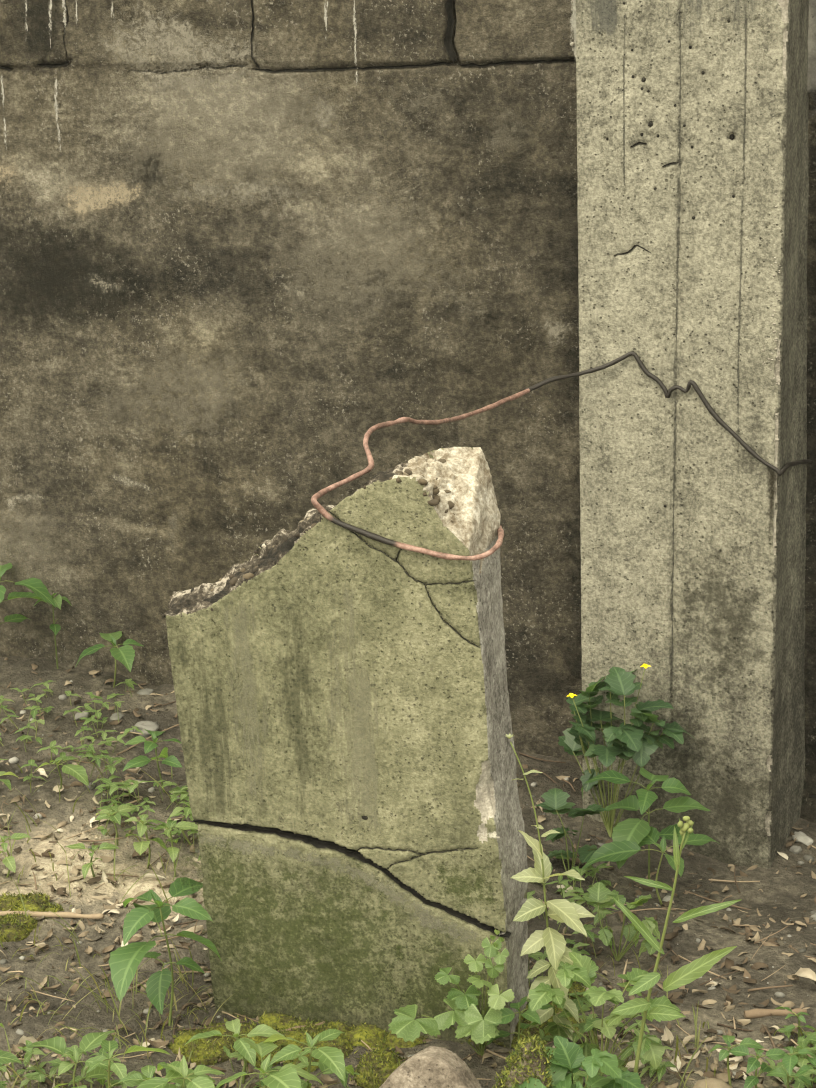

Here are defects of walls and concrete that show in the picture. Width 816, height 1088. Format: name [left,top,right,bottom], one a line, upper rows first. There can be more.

leakage [23,0,78,57]
leakage [100,4,254,95]
spalling [162,447,501,618]
crack [327,509,480,647]
crack [192,820,511,938]